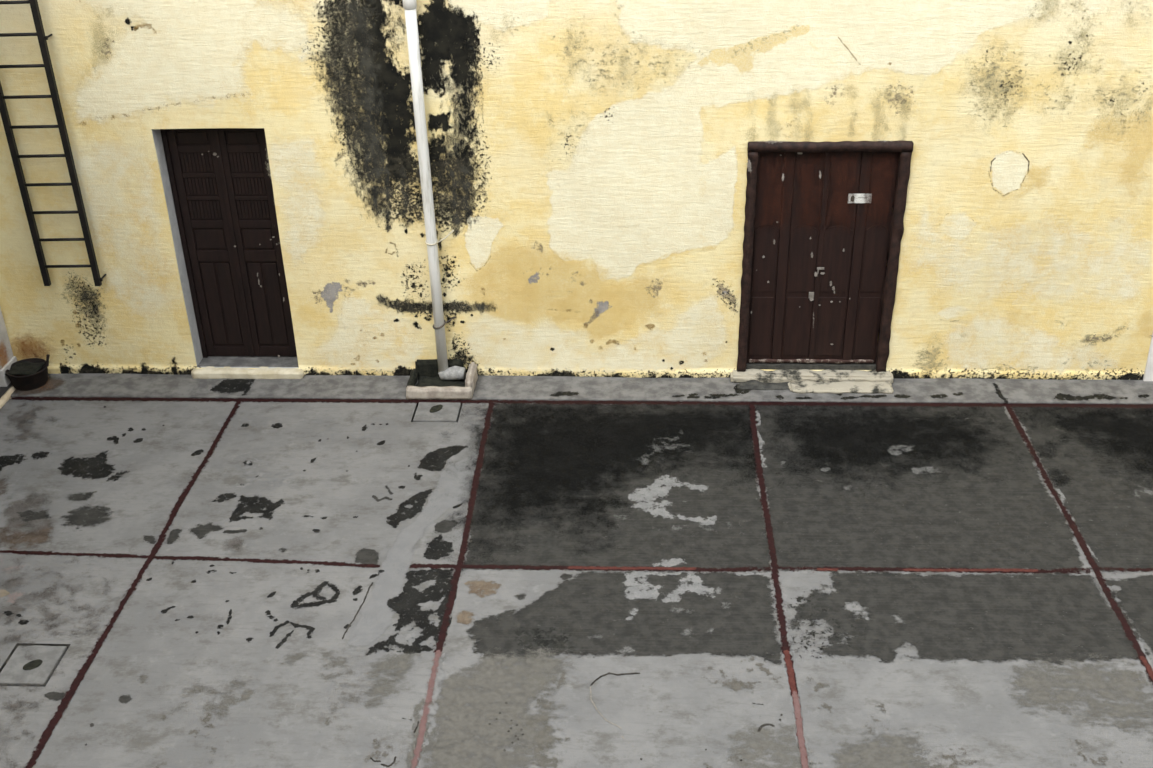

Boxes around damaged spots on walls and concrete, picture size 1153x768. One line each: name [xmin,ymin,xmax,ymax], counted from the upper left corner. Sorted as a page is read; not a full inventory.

flaking render [988,150,1030,196]
damp [69,276,106,321]
damp [60,357,201,375]
flaking render [306,279,429,374]
flaking render [462,293,728,375]
damp [261,0,1153,665]
damp [0,427,146,537]